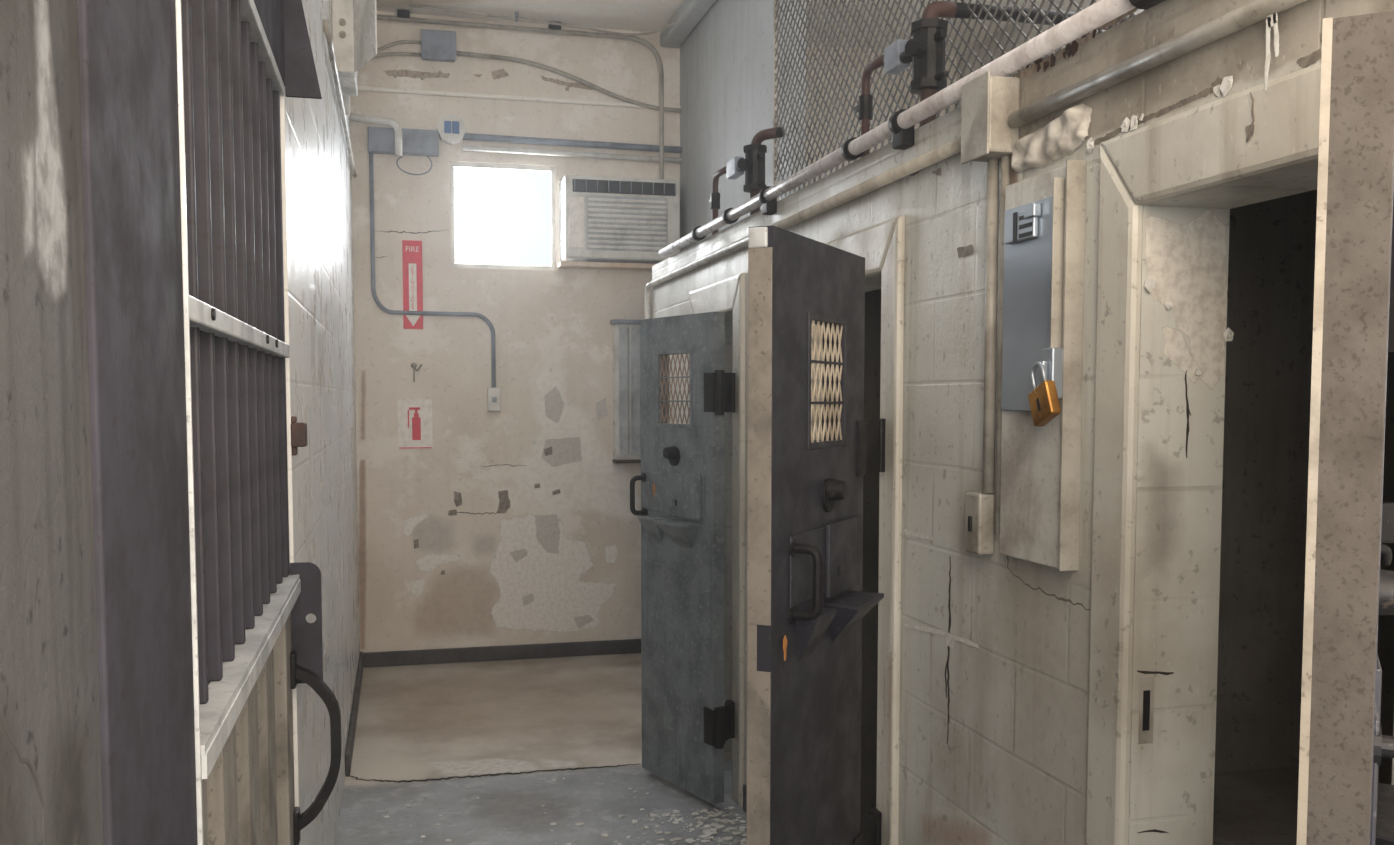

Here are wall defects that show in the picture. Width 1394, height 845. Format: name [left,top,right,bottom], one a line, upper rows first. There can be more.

crack [1184,370,1192,458]
flaking render [448,491,462,516]
peeling [490,362,641,634]
peeling [403,513,460,597]
crack [1007,556,1090,610]
crack [944,558,952,743]